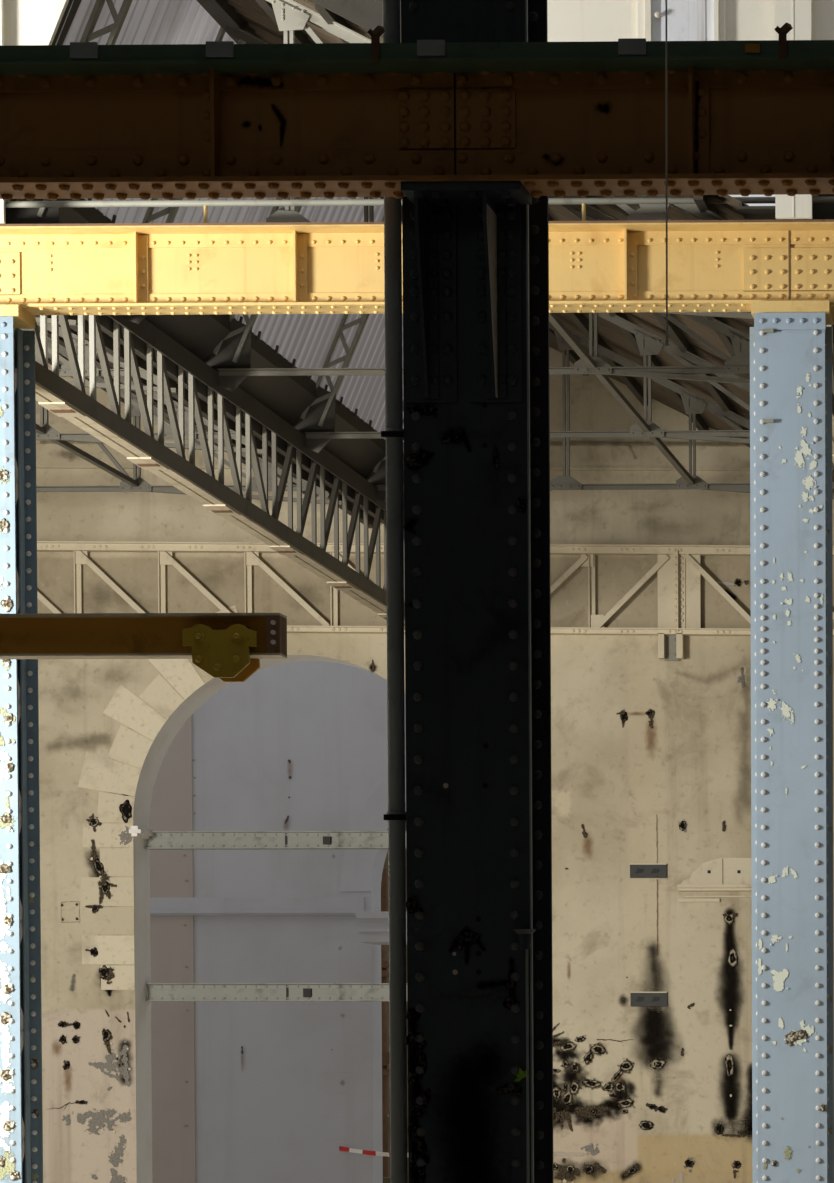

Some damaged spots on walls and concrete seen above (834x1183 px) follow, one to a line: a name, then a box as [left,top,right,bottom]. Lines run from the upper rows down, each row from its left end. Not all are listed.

peeling [779,373,823,523]
peeling [772,557,823,626]
peeling [766,689,794,766]
peeling [0,708,17,831]
peeling [0,860,39,1180]
peeling [88,1028,131,1091]
peeling [32,1100,131,1183]